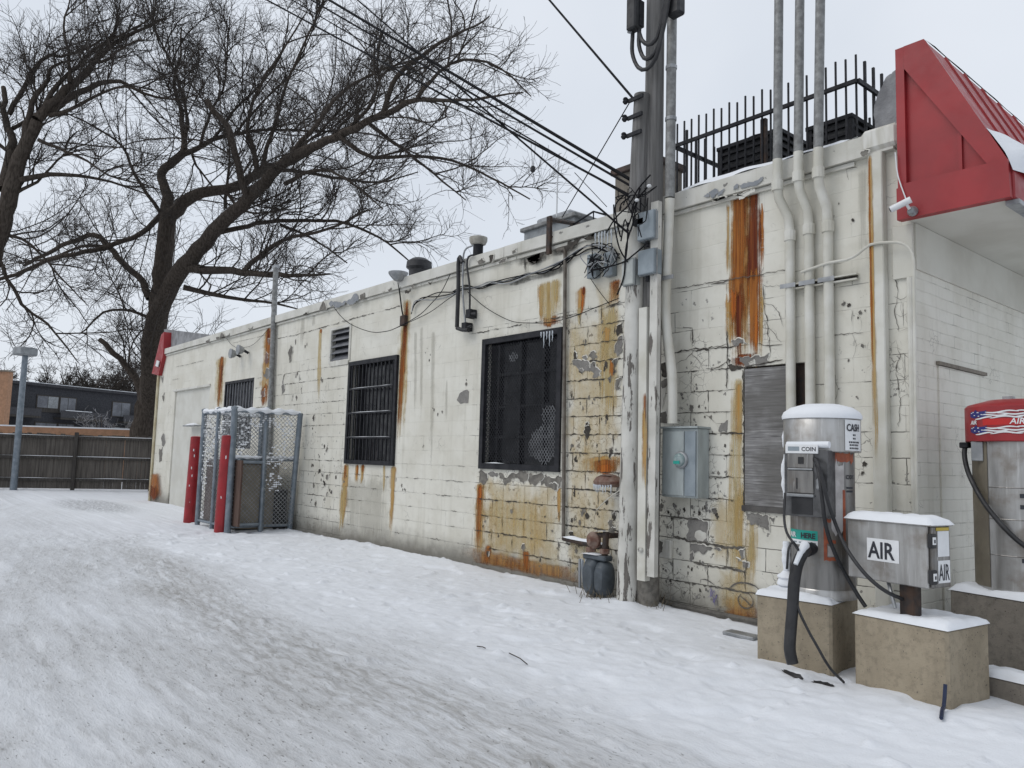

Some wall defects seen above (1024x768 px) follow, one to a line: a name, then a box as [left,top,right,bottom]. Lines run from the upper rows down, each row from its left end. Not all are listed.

peeling [704,177,763,202]
corrosion [215,356,224,407]
corrosion [398,301,410,429]
peeling [570,394,615,459]
peeling [572,320,624,391]
crack [663,270,785,595]
corrosion [725,194,764,366]
corrosion [868,156,878,447]
crack [894,280,908,427]
corrosion [475,483,491,562]
peeling [568,500,616,570]
peeling [660,471,722,584]